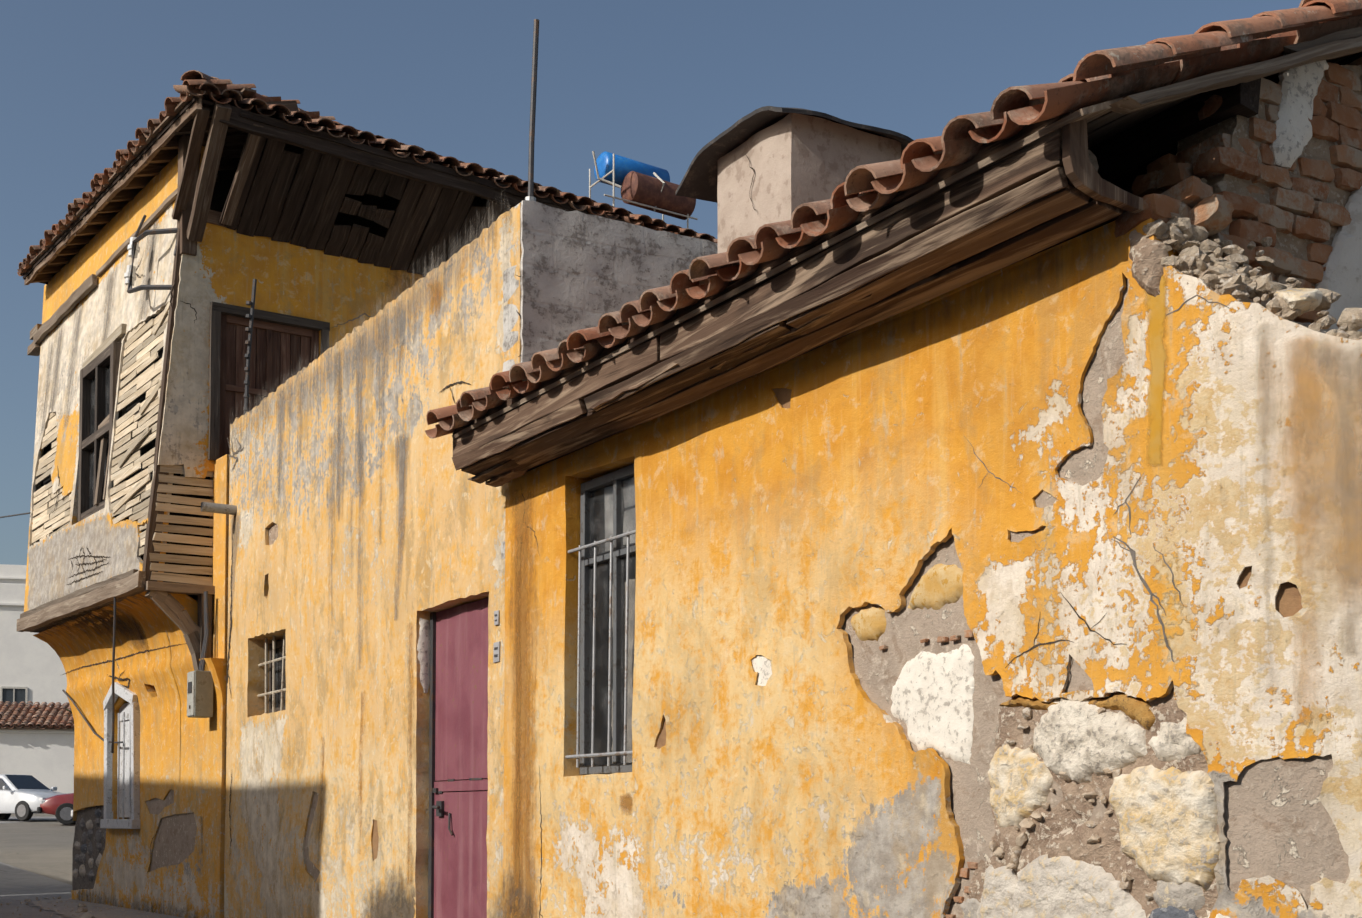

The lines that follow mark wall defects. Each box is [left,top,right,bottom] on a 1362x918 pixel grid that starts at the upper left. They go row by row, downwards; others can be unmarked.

damp [262,267,452,502]
peeling [1058,277,1129,486]
damp [231,518,239,586]
damp [395,438,405,573]
peeling [1009,526,1046,543]
peeling [1034,490,1057,508]
crack [1112,477,1183,662]
damp [1291,359,1362,586]
crack [1005,592,1122,686]
peeling [842,536,1350,918]
spalling [72,805,106,890]
damp [367,875,416,918]